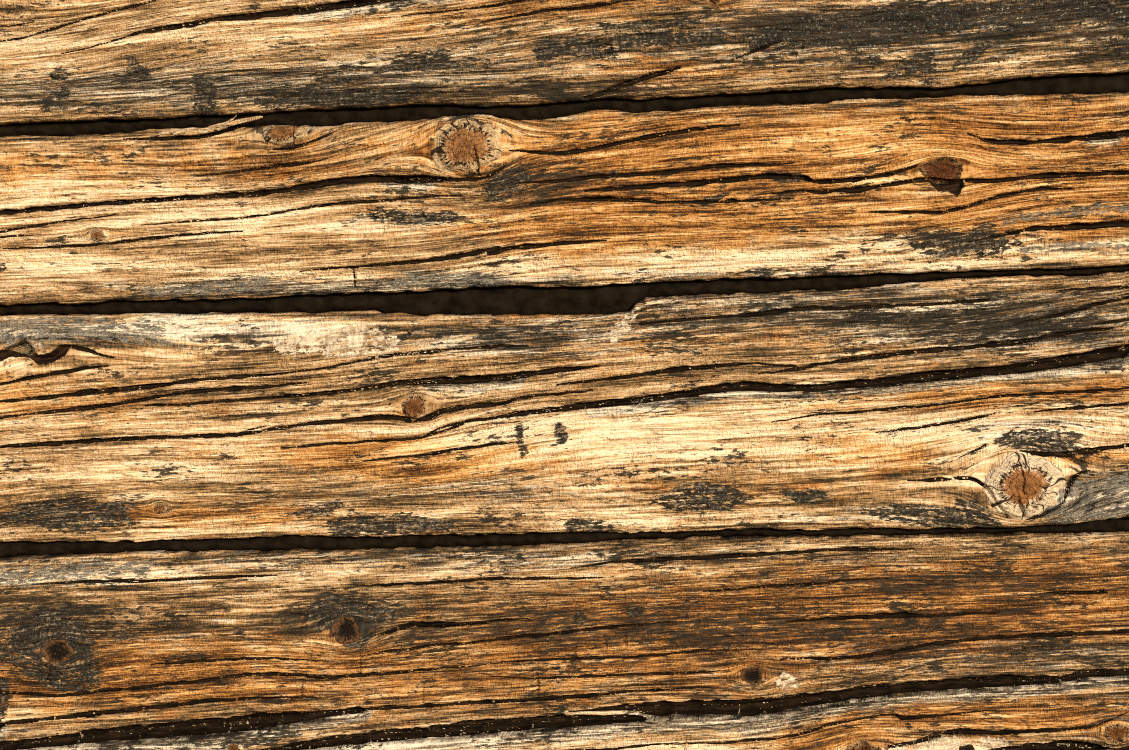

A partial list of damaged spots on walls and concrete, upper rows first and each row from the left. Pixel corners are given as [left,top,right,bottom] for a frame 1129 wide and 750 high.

crack [0,286,1129,486]
crack [1005,443,1129,520]
crack [37,575,277,585]
crack [355,547,914,587]
crack [703,578,887,592]
crack [1048,589,1108,597]
crack [0,612,1129,750]